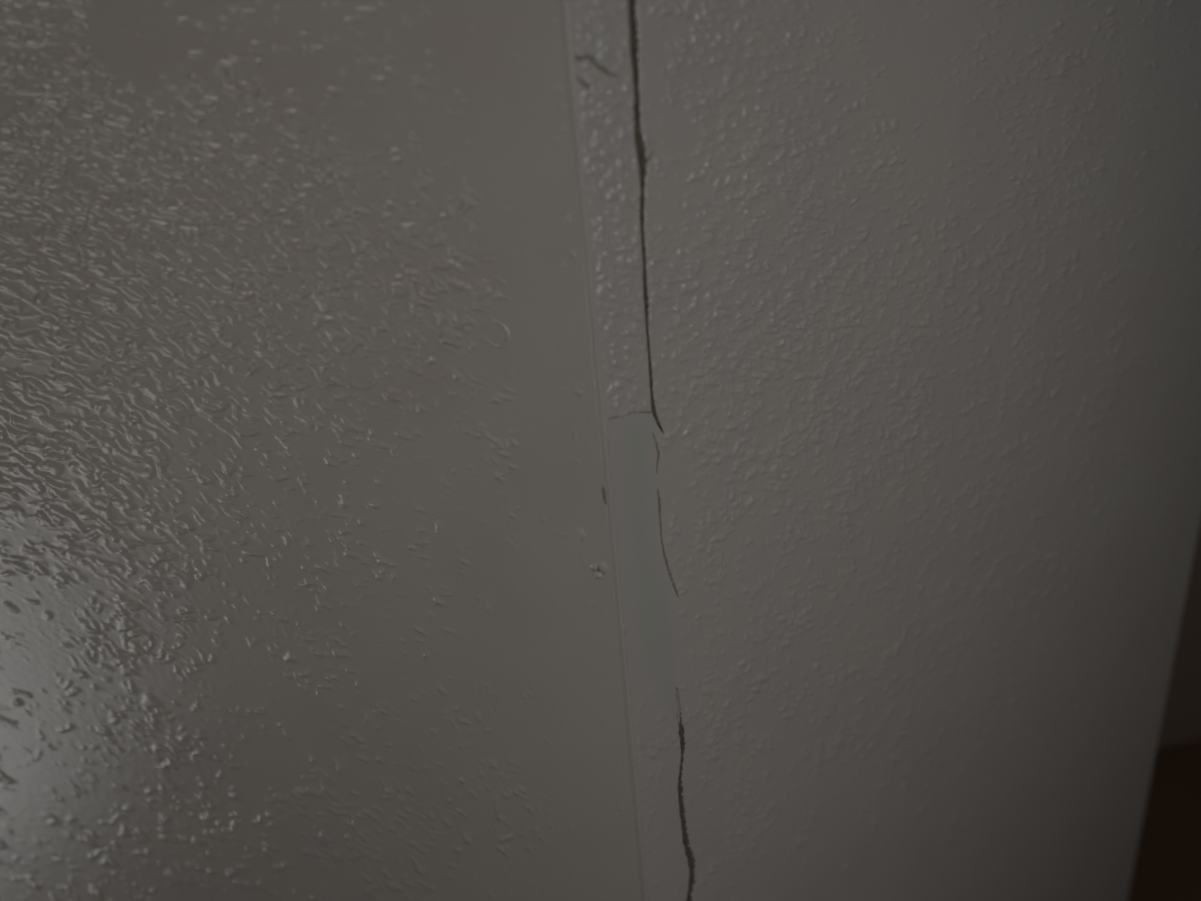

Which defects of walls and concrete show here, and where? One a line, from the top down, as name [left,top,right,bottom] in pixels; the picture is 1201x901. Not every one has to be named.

crack [676,688,696,901]